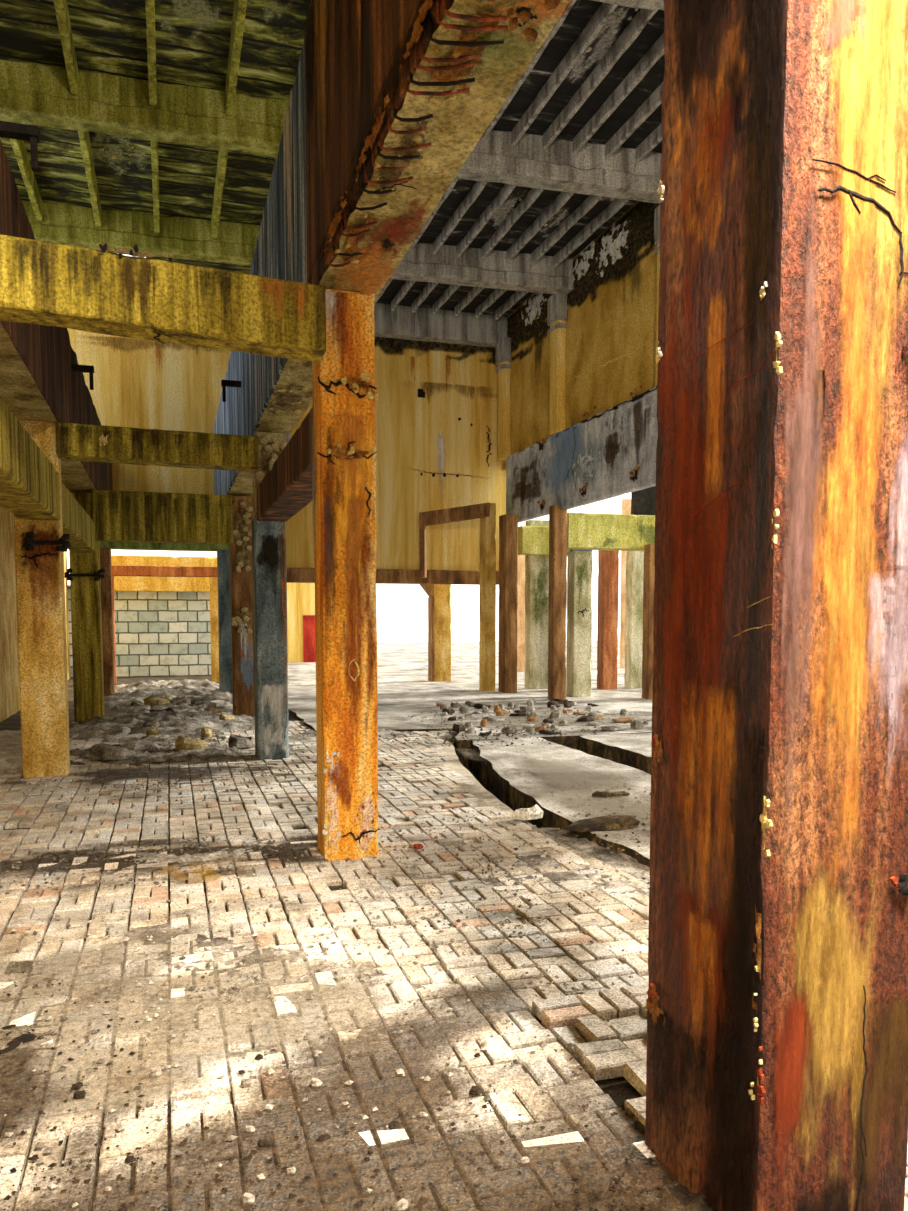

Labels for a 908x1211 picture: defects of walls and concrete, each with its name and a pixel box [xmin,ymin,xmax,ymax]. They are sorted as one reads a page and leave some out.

water stain [253,0,315,277]
crack [318,376,377,398]
corrosion [330,395,375,731]
water stain [374,337,496,384]
spalling [324,0,560,267]
water stain [507,201,660,376]
peeling [569,8,638,83]
water stain [629,403,651,459]
corrosion [659,277,735,1033]
crack [812,159,908,286]
corrosion [812,0,908,833]
corrosion [775,872,869,1136]